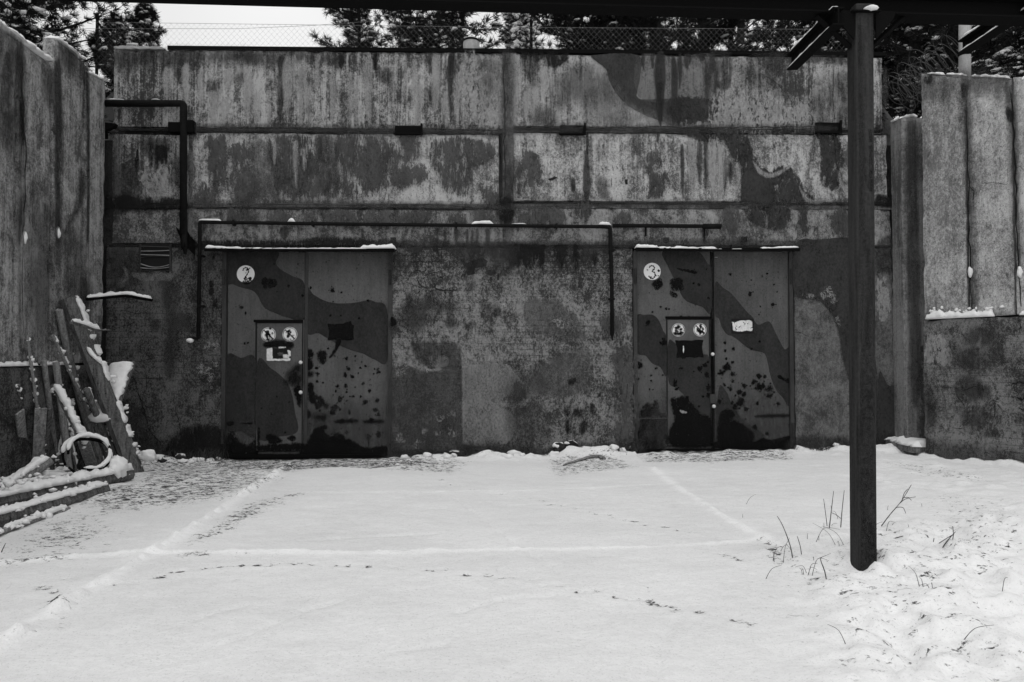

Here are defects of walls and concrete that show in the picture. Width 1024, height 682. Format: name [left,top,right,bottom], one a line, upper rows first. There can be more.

leakage [510,52,568,122]
leakage [641,50,732,143]
leakage [0,36,35,258]
leakage [44,43,90,243]
leakage [173,133,828,307]
leakage [82,279,91,313]
leakage [393,294,473,332]
leakage [389,443,553,457]
leakage [564,403,595,447]
leakage [607,437,645,453]